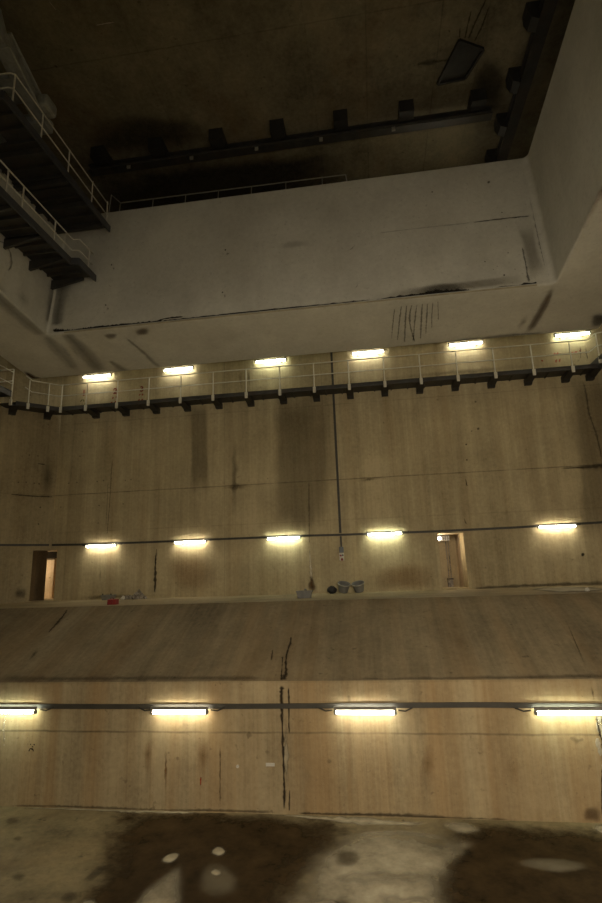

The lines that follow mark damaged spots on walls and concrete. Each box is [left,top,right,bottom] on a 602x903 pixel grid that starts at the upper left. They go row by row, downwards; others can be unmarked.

crack [53,289,466,332]
crack [151,549,159,591]
crack [271,638,292,810]
damp [40,806,602,903]